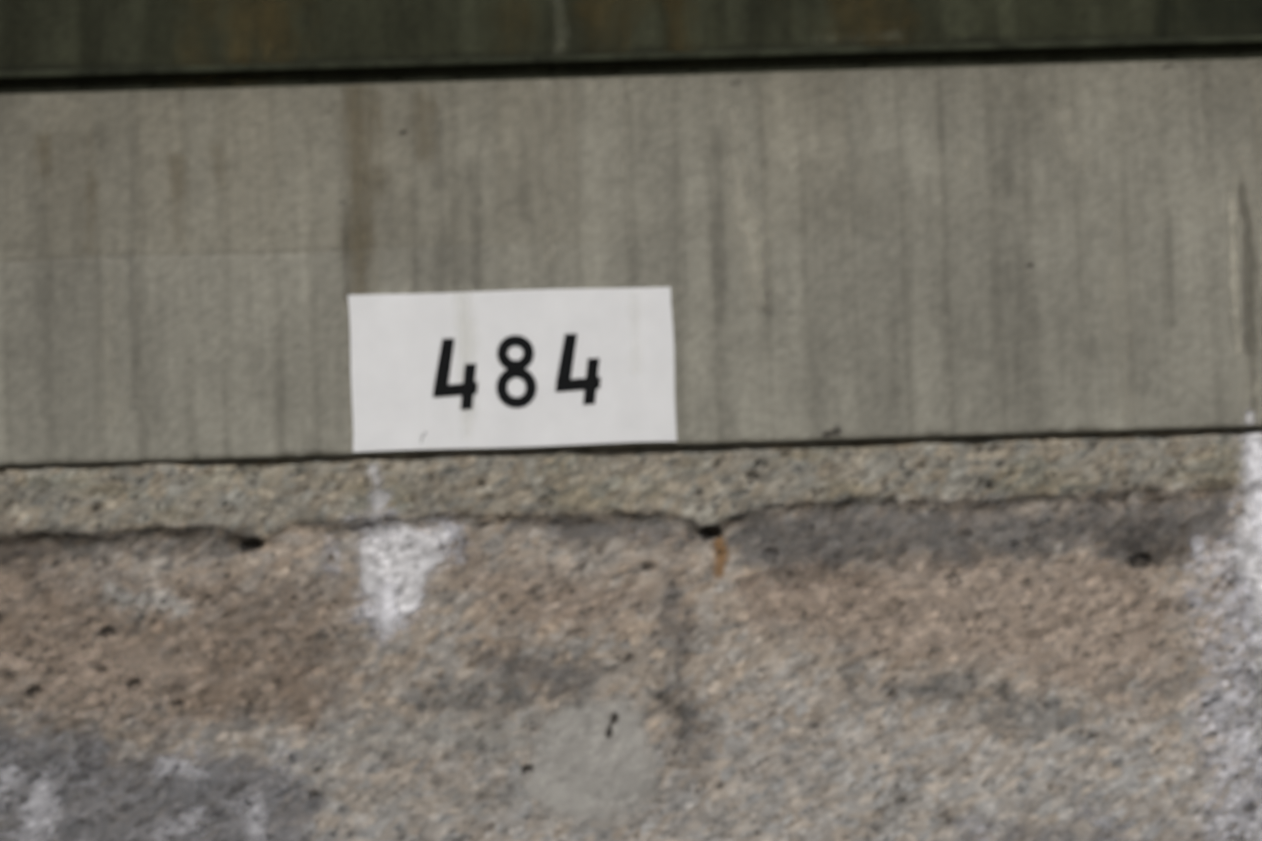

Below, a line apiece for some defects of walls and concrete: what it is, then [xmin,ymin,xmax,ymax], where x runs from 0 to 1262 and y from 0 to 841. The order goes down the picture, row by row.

damp [1228,195,1240,354]
rust [714,537,728,577]
damp [733,412,1262,841]